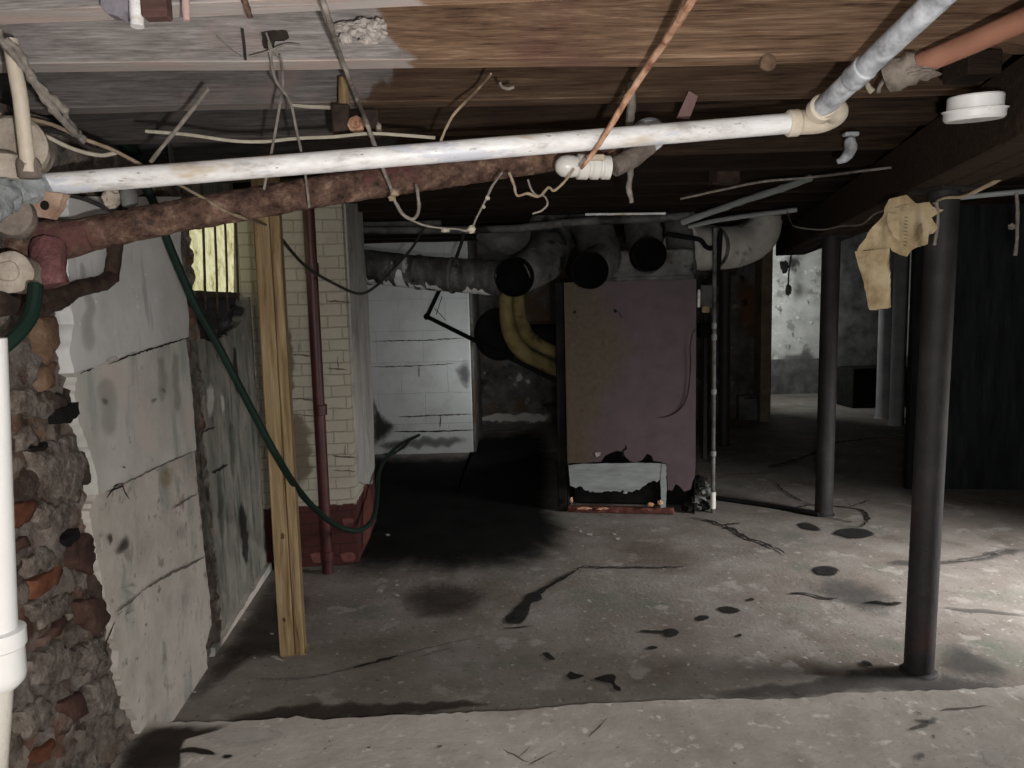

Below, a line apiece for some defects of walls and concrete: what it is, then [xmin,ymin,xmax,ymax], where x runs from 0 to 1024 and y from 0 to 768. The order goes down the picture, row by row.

crack [81,337,190,374]
crack [107,427,215,498]
crack [769,437,905,527]
spalling [10,315,118,764]
flaking render [108,534,129,553]
crack [690,517,786,554]
crack [547,566,684,587]
crack [104,556,206,657]
leakage [407,586,479,615]